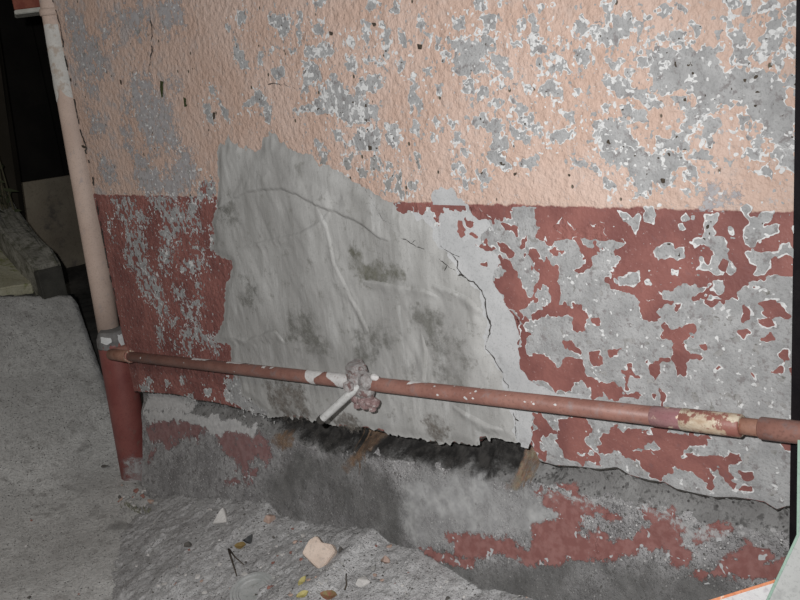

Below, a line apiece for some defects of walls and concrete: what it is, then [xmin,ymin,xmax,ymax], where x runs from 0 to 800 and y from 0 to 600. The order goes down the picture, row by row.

peeling [198,76,275,132]
peeling [97,71,221,360]
crack [439,246,509,388]
peeling [225,0,796,420]
spalling [134,373,790,584]